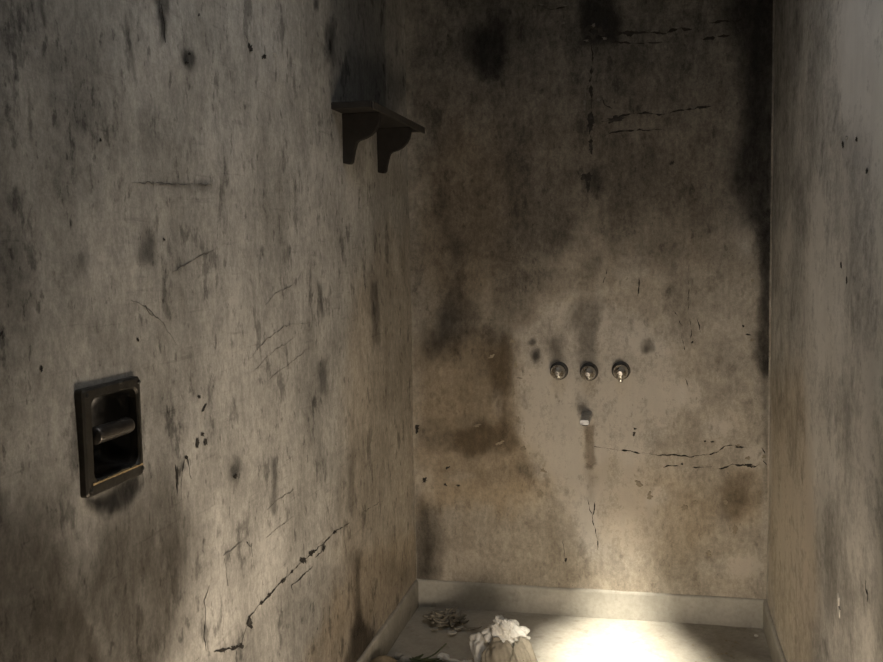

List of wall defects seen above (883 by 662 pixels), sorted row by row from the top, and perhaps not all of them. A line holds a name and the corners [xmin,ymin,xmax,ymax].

crack [583,16,751,154]
crack [594,440,767,469]
crack [204,523,349,653]